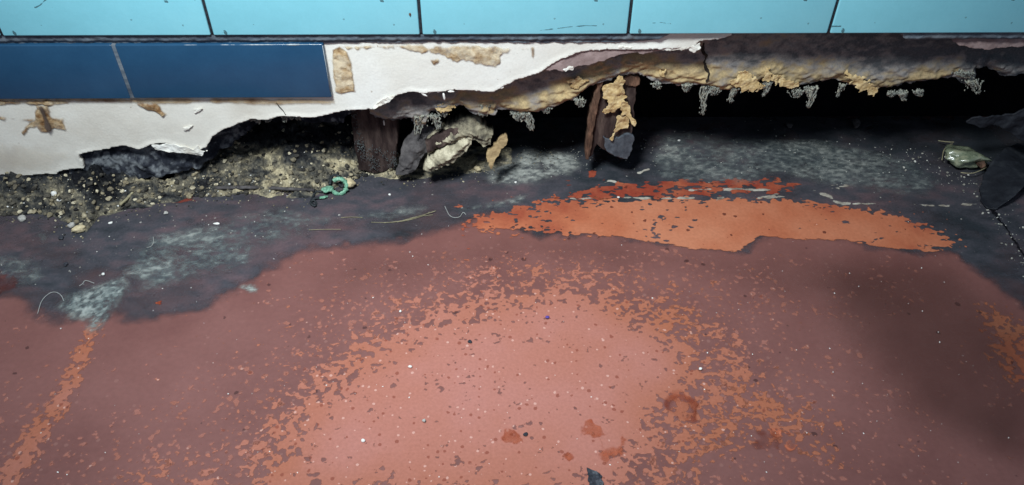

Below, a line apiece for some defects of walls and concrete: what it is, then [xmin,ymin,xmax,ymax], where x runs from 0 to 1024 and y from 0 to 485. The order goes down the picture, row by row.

peeling [333,47,354,94]
spalling [369,32,1024,136]
damp [0,116,1024,331]
peeling [461,170,967,252]
peeling [111,255,853,485]
peeling [974,302,1024,392]